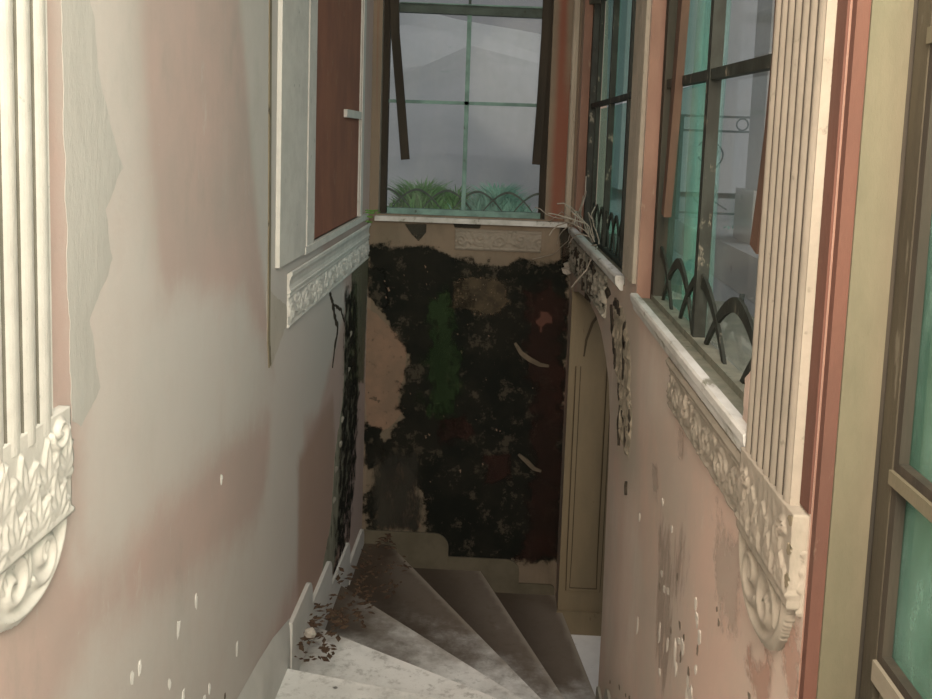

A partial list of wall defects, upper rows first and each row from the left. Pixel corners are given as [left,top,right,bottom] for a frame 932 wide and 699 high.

leakage [333,224,570,576]
spalling [605,287,632,458]